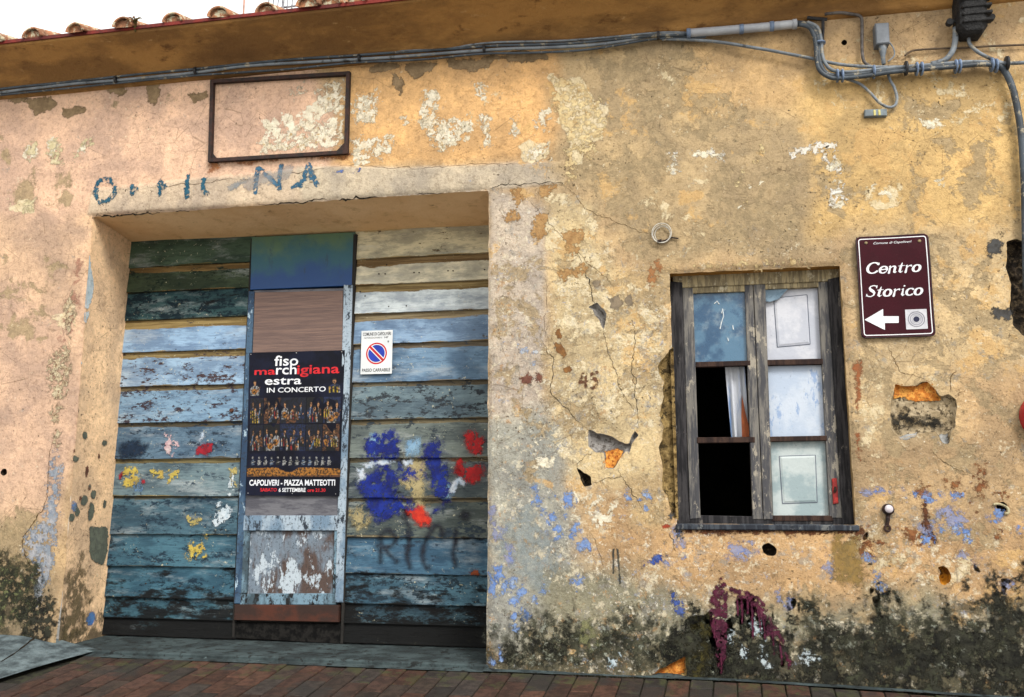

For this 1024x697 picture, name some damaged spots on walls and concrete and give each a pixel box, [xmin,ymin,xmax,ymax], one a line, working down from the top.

peeling [256,78,397,165]
peeling [369,50,548,153]
peeling [502,185,548,245]
peeling [557,228,601,287]
spalling [1005,239,1024,336]
peeling [21,255,109,607]
crack [543,279,577,421]
spalling [588,429,638,469]
crack [603,322,638,428]
spalling [890,381,957,444]
leakage [0,550,91,643]
leakage [487,560,1024,697]